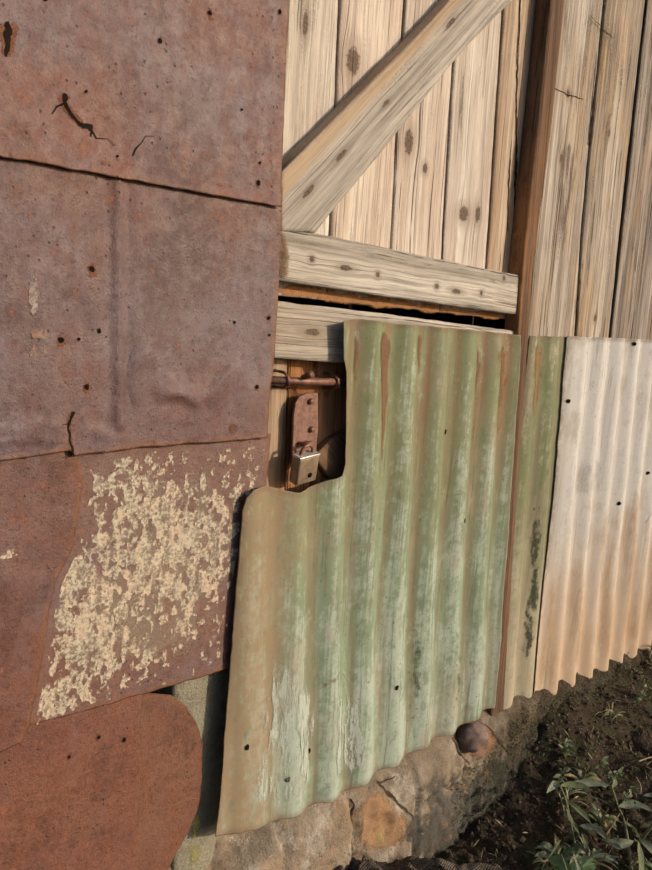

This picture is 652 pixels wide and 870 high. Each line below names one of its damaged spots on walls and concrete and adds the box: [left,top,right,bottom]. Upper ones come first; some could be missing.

crack [52,93,146,156]
crack [67,411,75,457]
rust [0,0,289,870]
rust [288,374,329,394]
rust [381,333,390,440]
peeling [36,446,264,725]
water stain [525,509,542,656]
crack [377,776,415,825]